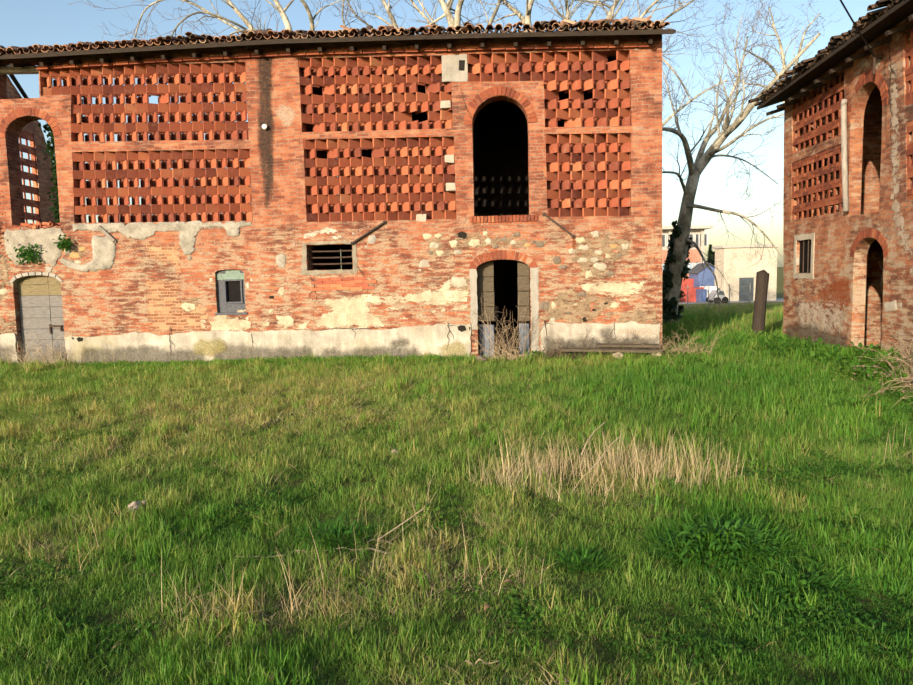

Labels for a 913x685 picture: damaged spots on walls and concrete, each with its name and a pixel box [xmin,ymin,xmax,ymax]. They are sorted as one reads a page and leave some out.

damp [258,57,273,201]
flaking render [0,220,252,289]
peeling [386,297,468,320]